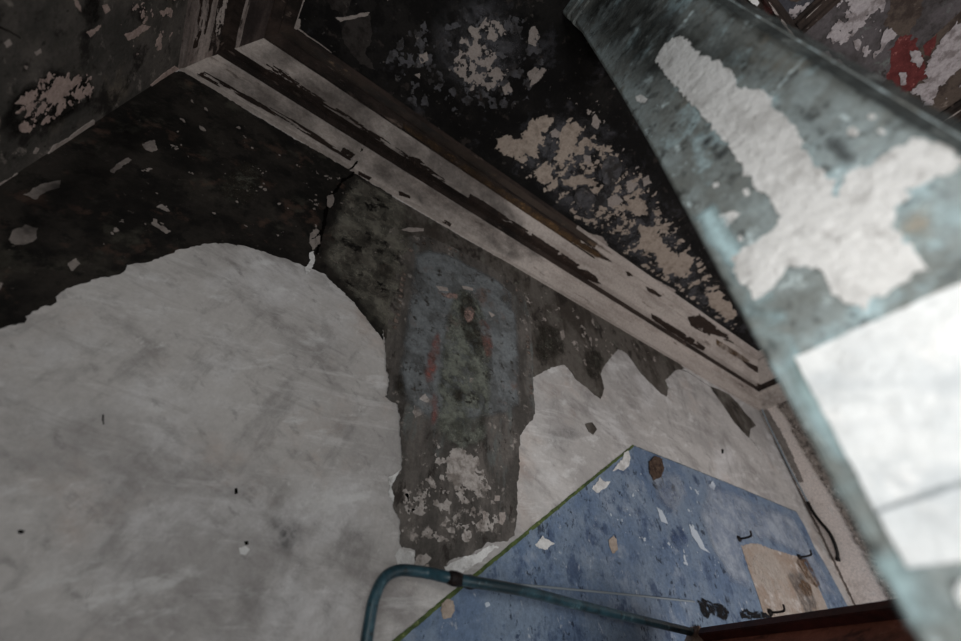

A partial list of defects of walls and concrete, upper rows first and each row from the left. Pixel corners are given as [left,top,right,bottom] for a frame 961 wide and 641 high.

peeling [749,0,826,23]
peeling [826,0,898,58]
peeling [899,21,961,106]
peeling [655,36,961,312]
peeling [0,64,685,399]
peeling [495,101,737,351]
peeling [710,386,756,437]
spalling [592,451,631,493]
flaking render [763,400,895,600]
flaking render [395,545,499,573]
spalling [535,536,555,550]
flaking render [639,477,829,618]